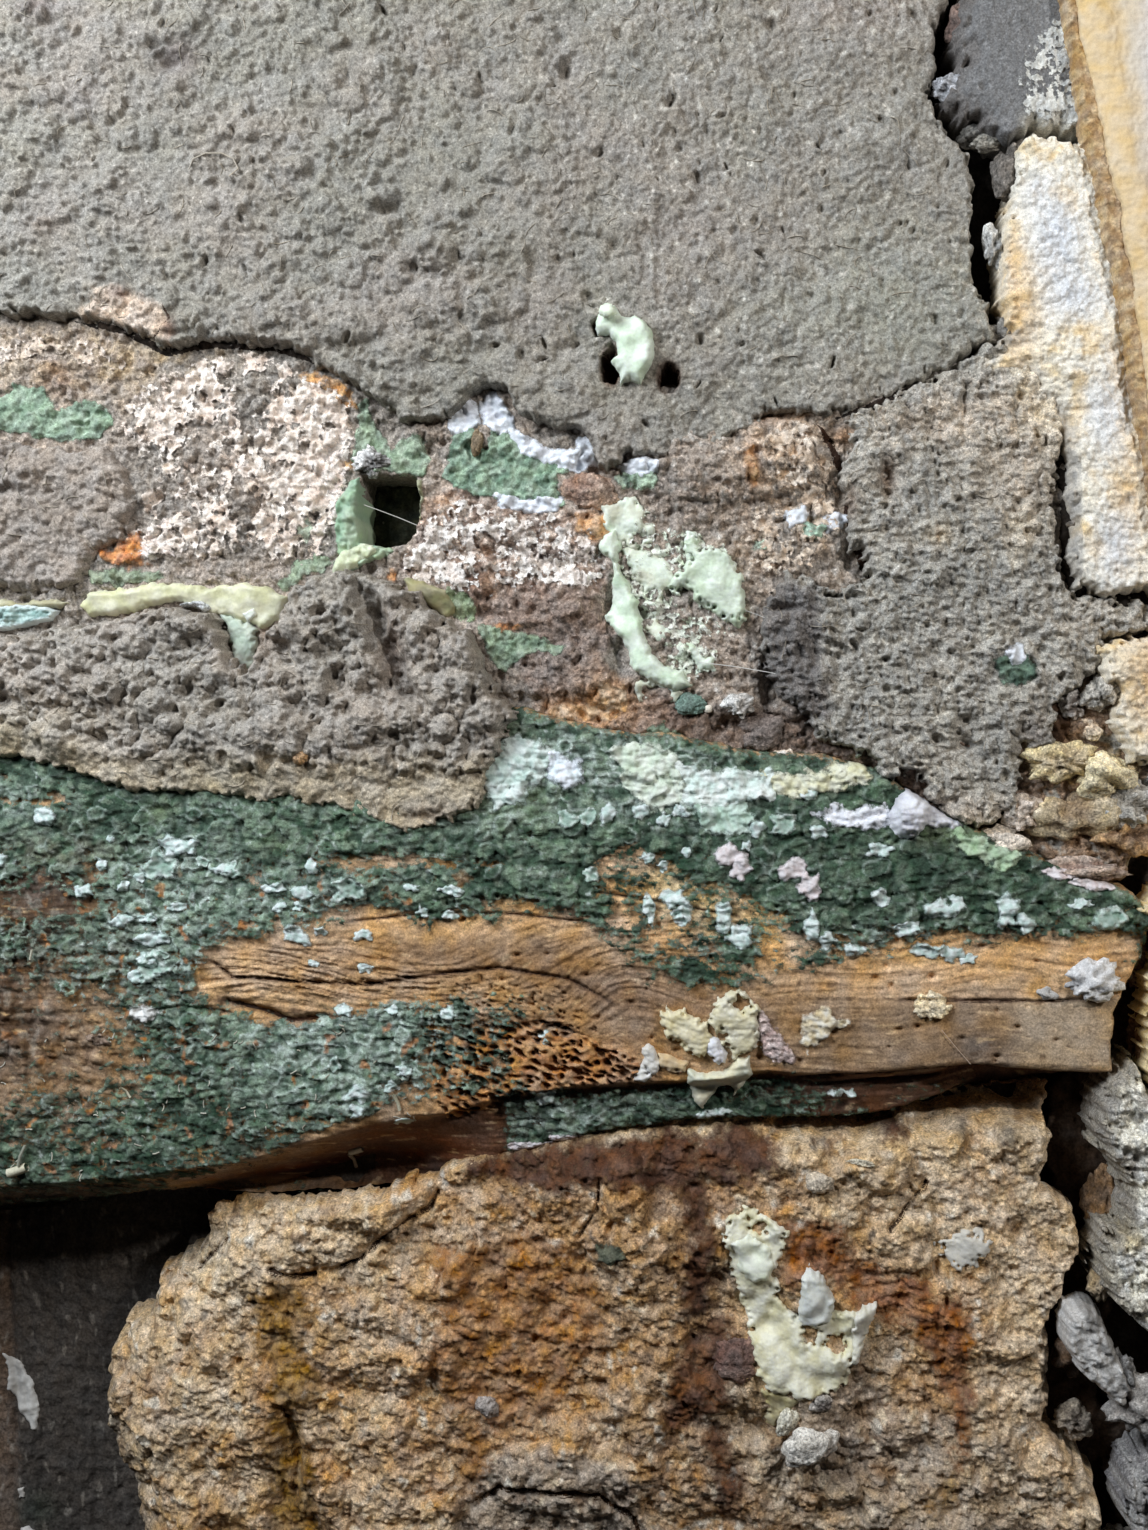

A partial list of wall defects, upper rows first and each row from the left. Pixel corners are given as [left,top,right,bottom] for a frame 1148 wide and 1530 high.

crack [929,0,957,107]
crack [959,146,1001,325]
crack [75,305,314,364]
spalling [592,323,620,385]
spalling [658,363,680,393]
spalling [351,444,421,548]
spalling [675,692,707,715]
corrosion [428,1228,604,1497]
corrosion [775,1218,977,1465]